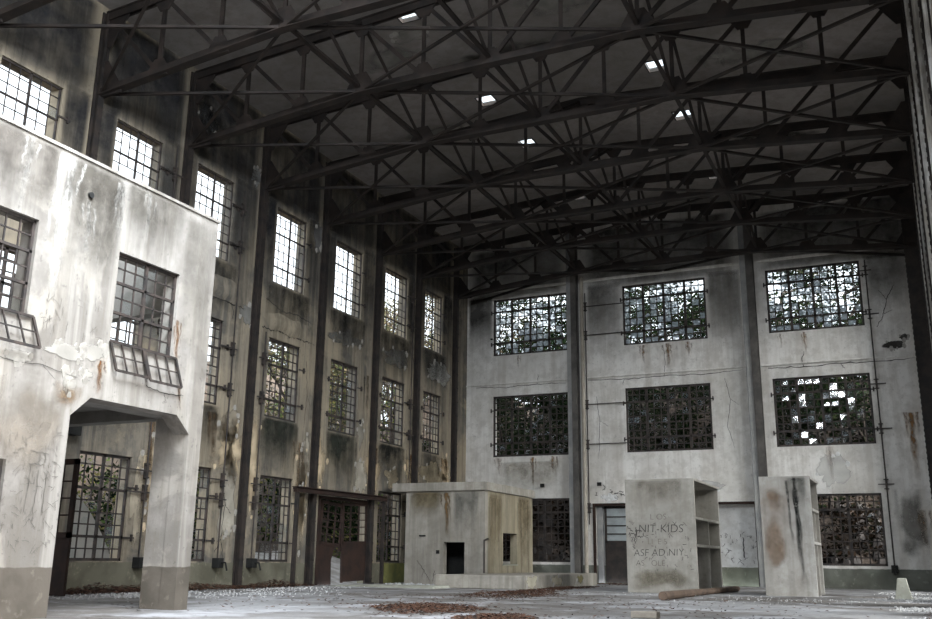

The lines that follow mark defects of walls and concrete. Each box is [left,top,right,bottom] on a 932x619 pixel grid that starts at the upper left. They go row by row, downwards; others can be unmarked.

leakage [0,122,158,267]
peeling [44,338,109,398]
spalling [882,334,910,351]
corrosion [903,412,918,457]
leakage [902,501,926,553]